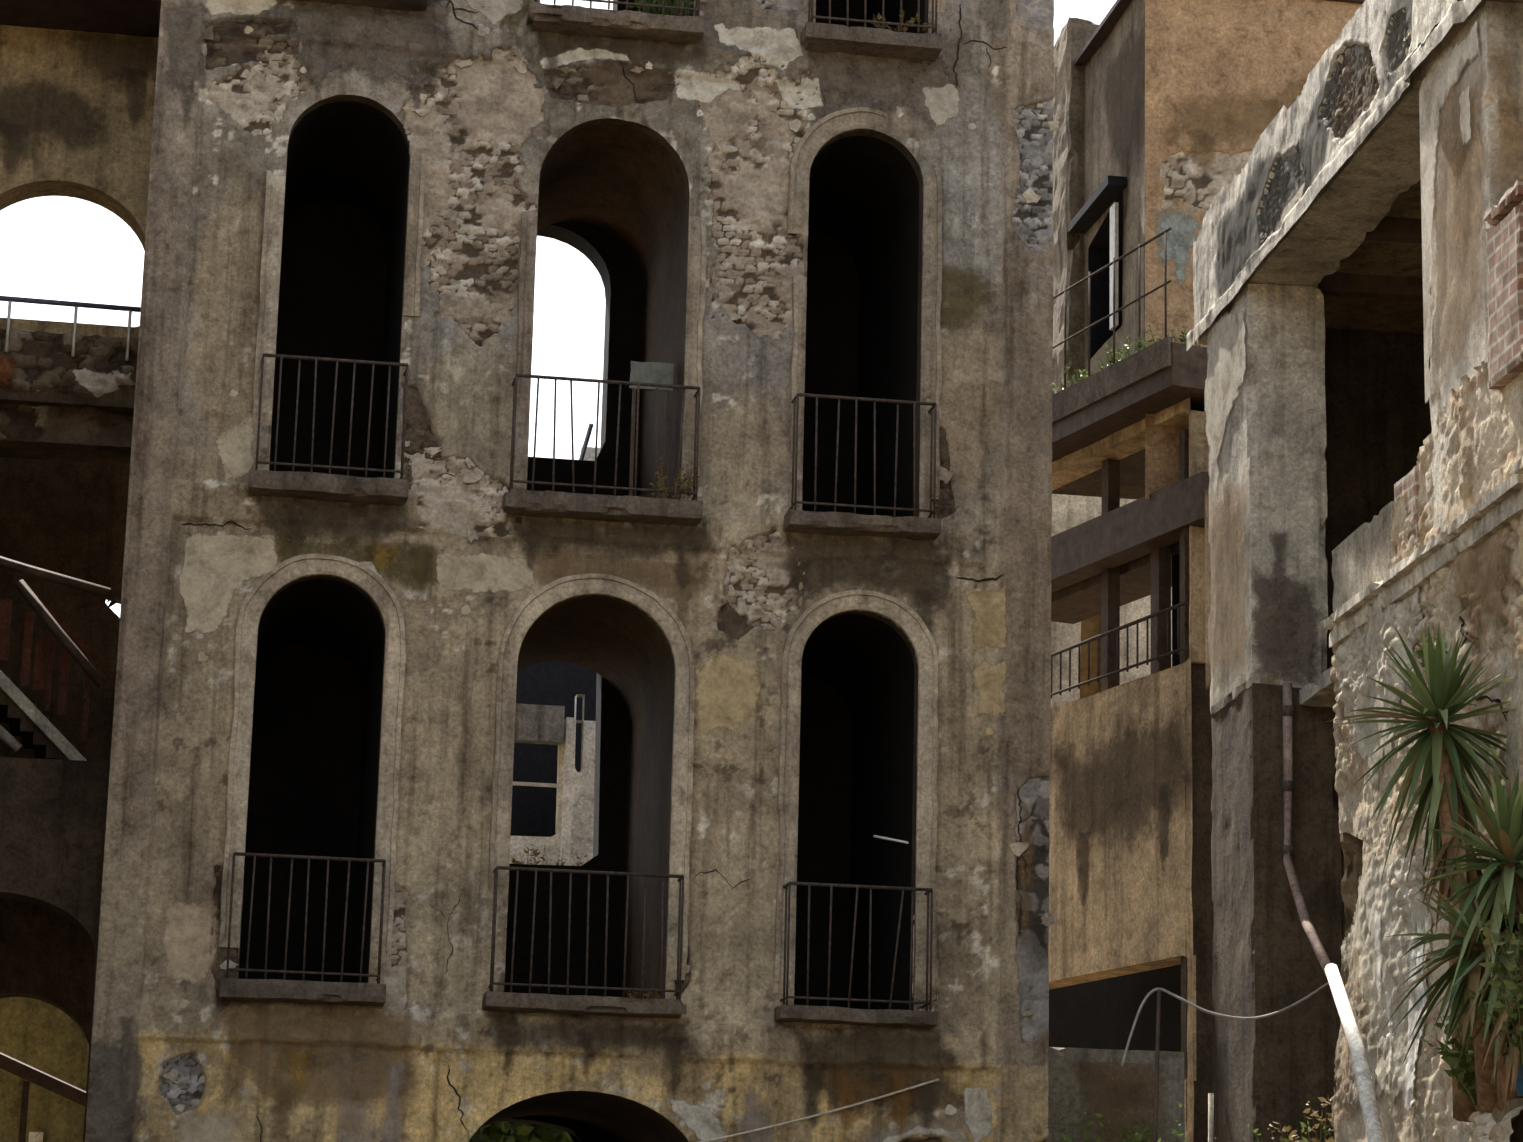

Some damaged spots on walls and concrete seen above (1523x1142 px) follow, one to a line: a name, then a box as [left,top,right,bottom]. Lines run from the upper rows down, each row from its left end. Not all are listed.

leakage [0,82,98,170]
flaking render [204,0,316,136]
flaking render [403,0,823,347]
flaking render [1012,99,1060,253]
flaking render [1160,147,1255,212]
flaking render [1331,29,1410,138]
flaking render [401,384,534,615]
flaking render [695,529,799,760]
leakage [1055,723,1192,904]
flaking render [1008,776,1056,1043]
flaking render [159,1053,205,1115]
peeling [882,1087,993,1142]